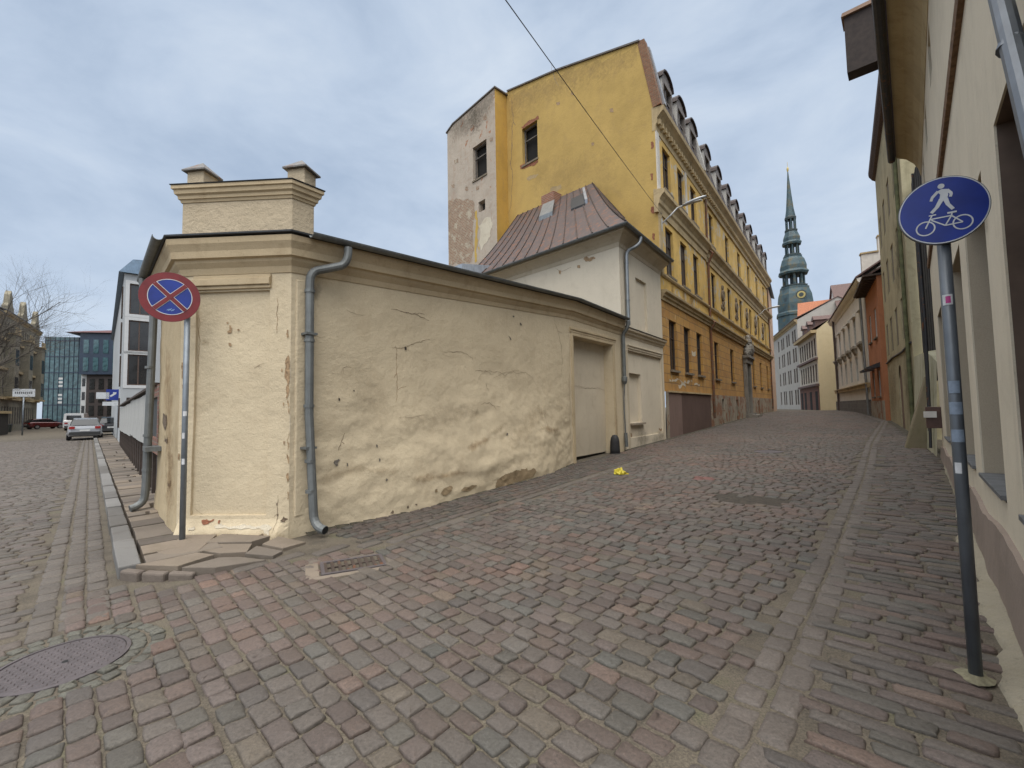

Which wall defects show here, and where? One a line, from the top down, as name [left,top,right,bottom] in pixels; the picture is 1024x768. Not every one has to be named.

peeling [448,184,493,264]
peeling [281,355,290,413]
crack [393,309,535,419]
peeling [188,437,289,536]
spalling [435,485,477,496]
spalling [496,468,536,488]